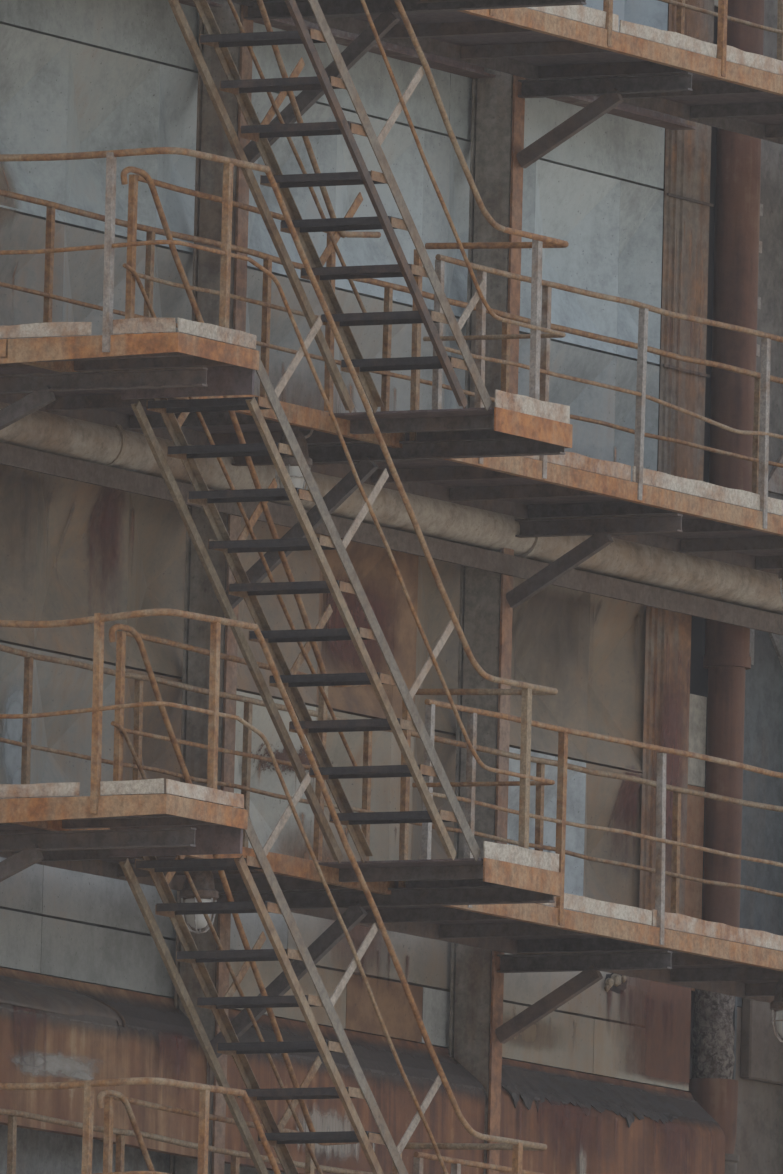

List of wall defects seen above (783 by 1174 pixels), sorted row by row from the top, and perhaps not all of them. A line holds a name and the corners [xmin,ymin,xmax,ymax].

corrosion [677,428,693,480]
corrosion [326,580,394,669]
corrosion [654,639,689,861]